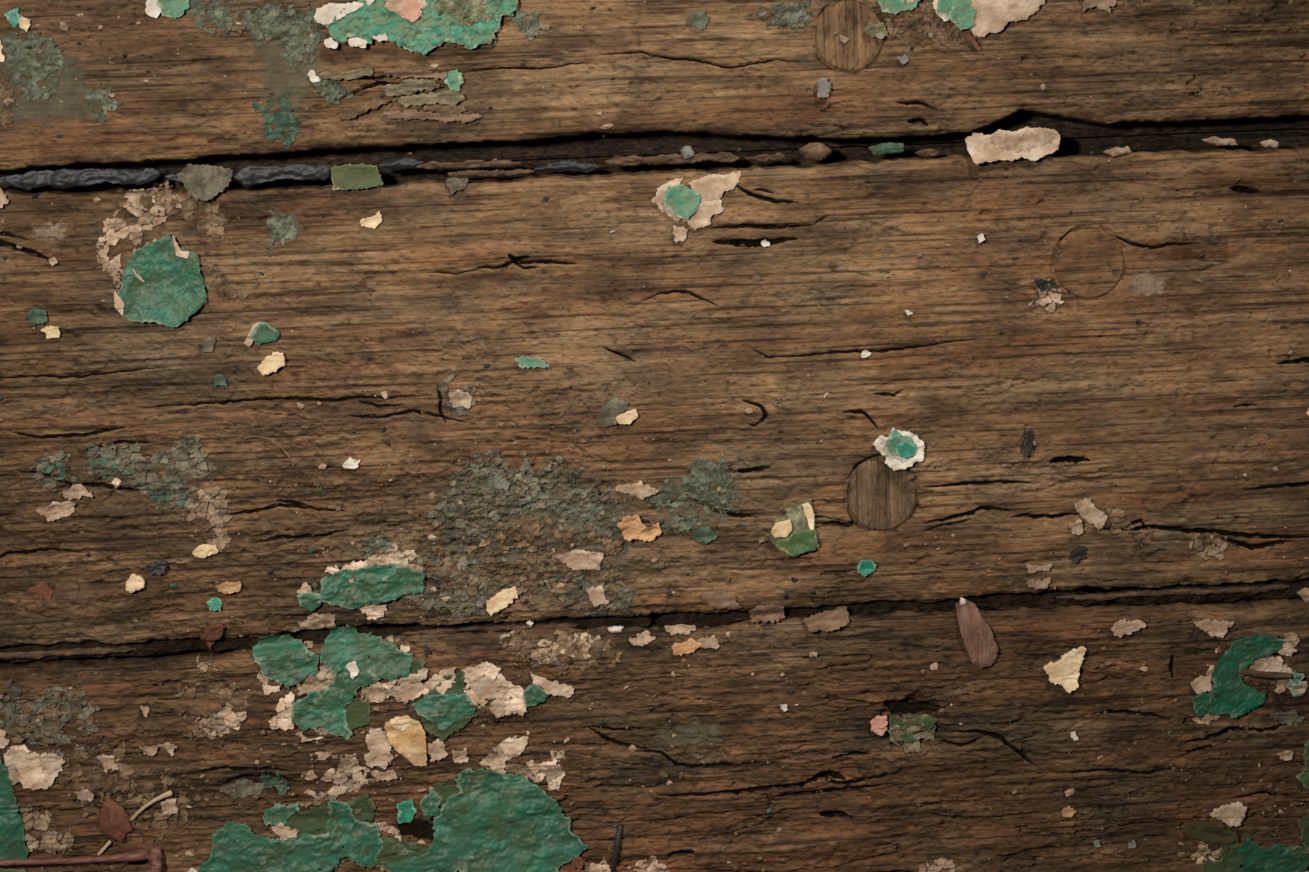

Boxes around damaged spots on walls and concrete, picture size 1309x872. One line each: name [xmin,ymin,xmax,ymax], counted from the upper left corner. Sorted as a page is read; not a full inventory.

peeling [864,0,1045,64]
peeling [96,164,259,328]
peeling [360,211,382,229]
peeling [651,171,741,243]
peeling [244,322,285,376]
peeling [30,436,238,558]
peeling [125,573,145,593]
peeling [803,606,849,633]
peeling [188,449,719,872]
peeling [1190,618,1306,726]
peeling [0,652,251,872]
peeling [1190,801,1309,872]